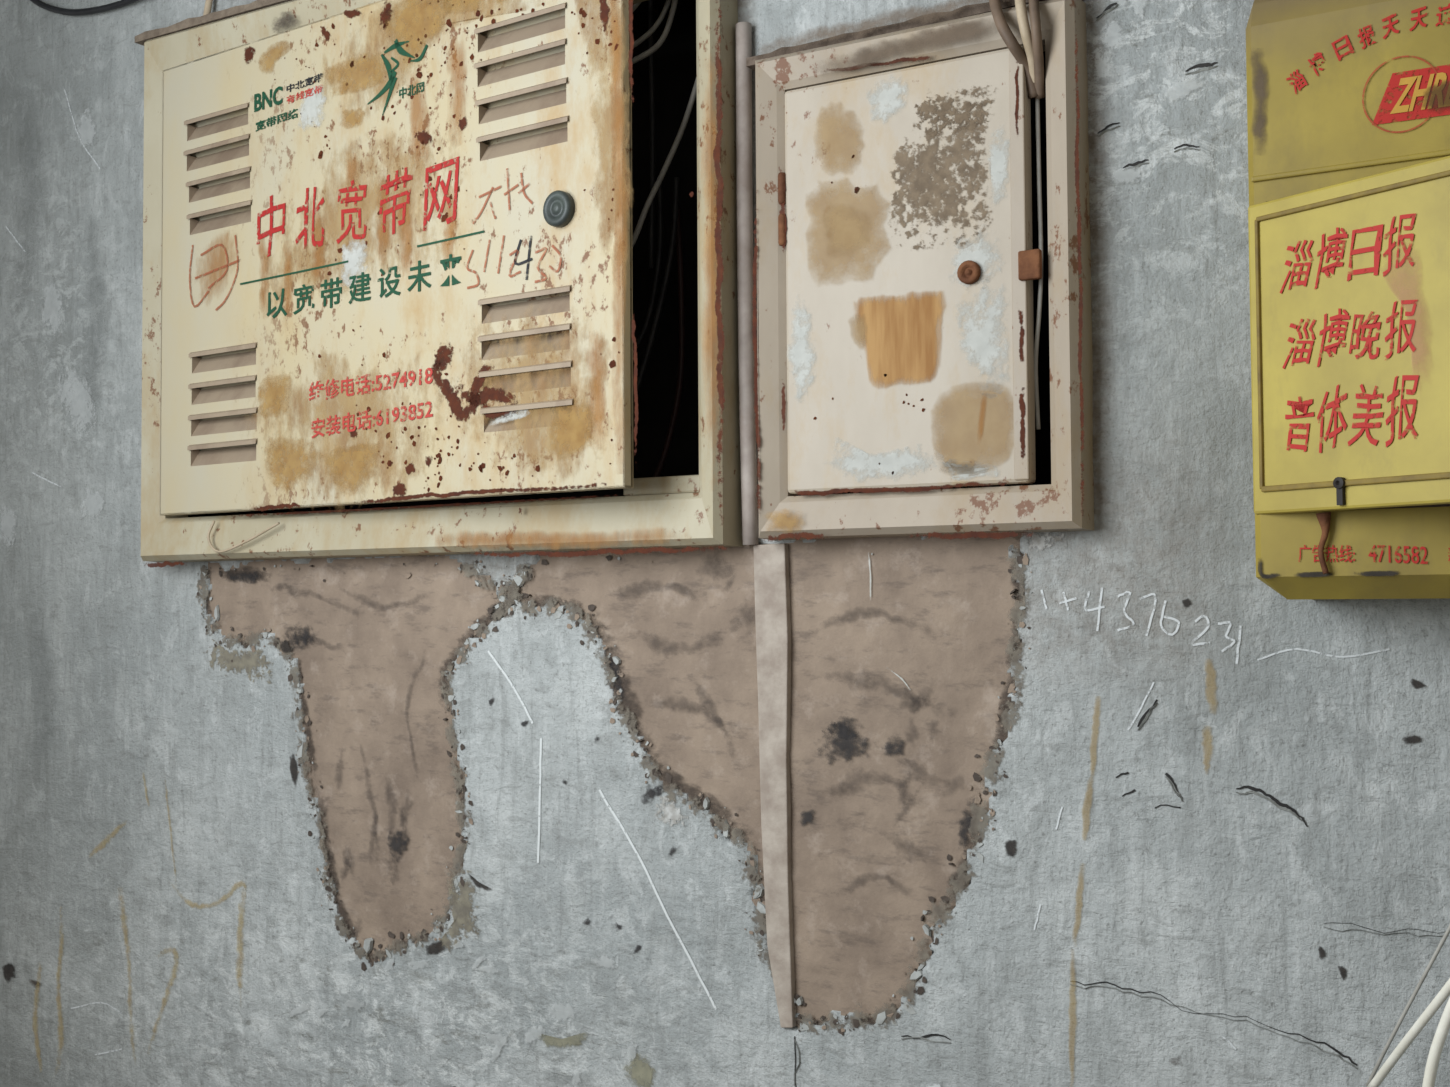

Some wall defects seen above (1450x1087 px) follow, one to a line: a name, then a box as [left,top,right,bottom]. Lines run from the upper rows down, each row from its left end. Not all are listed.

spalling [196,532,1064,1041]
crack [1070,981,1358,1069]